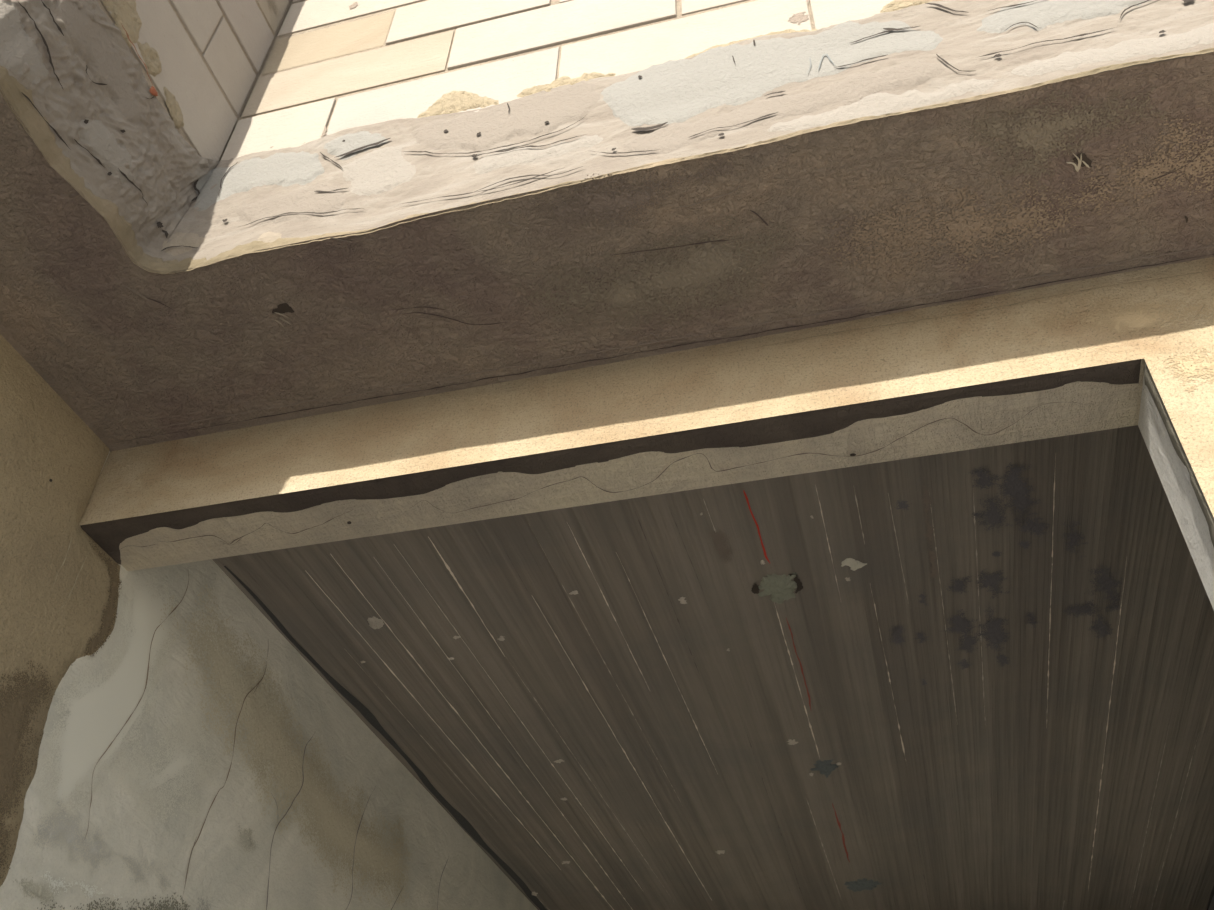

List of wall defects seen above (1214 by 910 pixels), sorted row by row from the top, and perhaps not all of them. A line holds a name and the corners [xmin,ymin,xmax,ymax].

peeling [788,12,809,24]
crack [121,510,352,549]
crack [409,402,1090,513]
leakage [887,551,1011,669]
leakage [968,462,1124,638]
crack [85,573,189,838]
leakage [0,540,413,910]
crack [182,655,268,899]
crack [266,731,316,910]